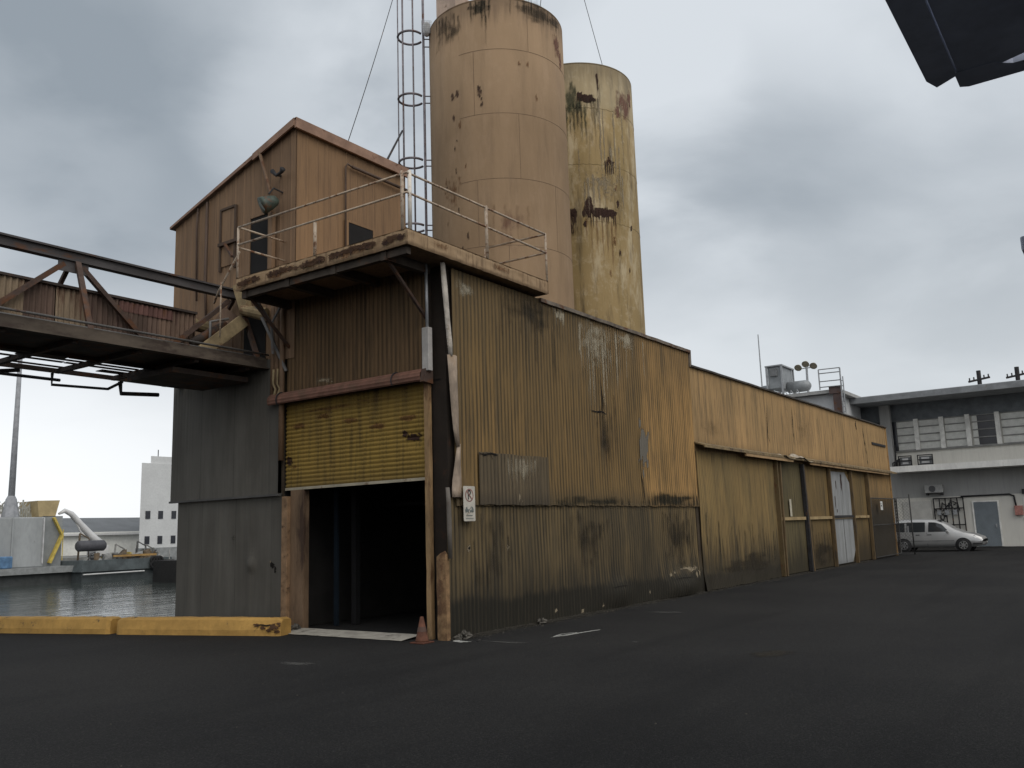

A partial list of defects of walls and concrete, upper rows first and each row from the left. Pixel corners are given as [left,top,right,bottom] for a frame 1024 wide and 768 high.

corrosion [577,74,598,110]
corrosion [570,197,617,245]
corrosion [400,415,422,441]
damp [649,494,698,506]